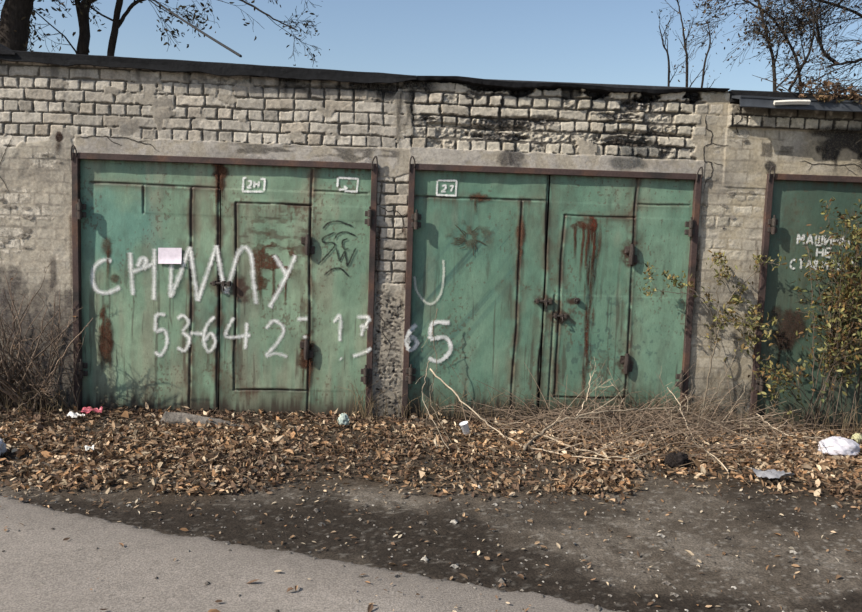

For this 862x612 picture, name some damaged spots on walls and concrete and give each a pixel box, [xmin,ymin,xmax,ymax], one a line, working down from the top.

damp [612,136,657,168]
crack [703,108,752,193]
damp [812,126,862,166]
corrosion [517,220,525,264]
corrosion [99,306,113,362]
corrosion [572,217,601,395]
corrosion [772,307,806,369]